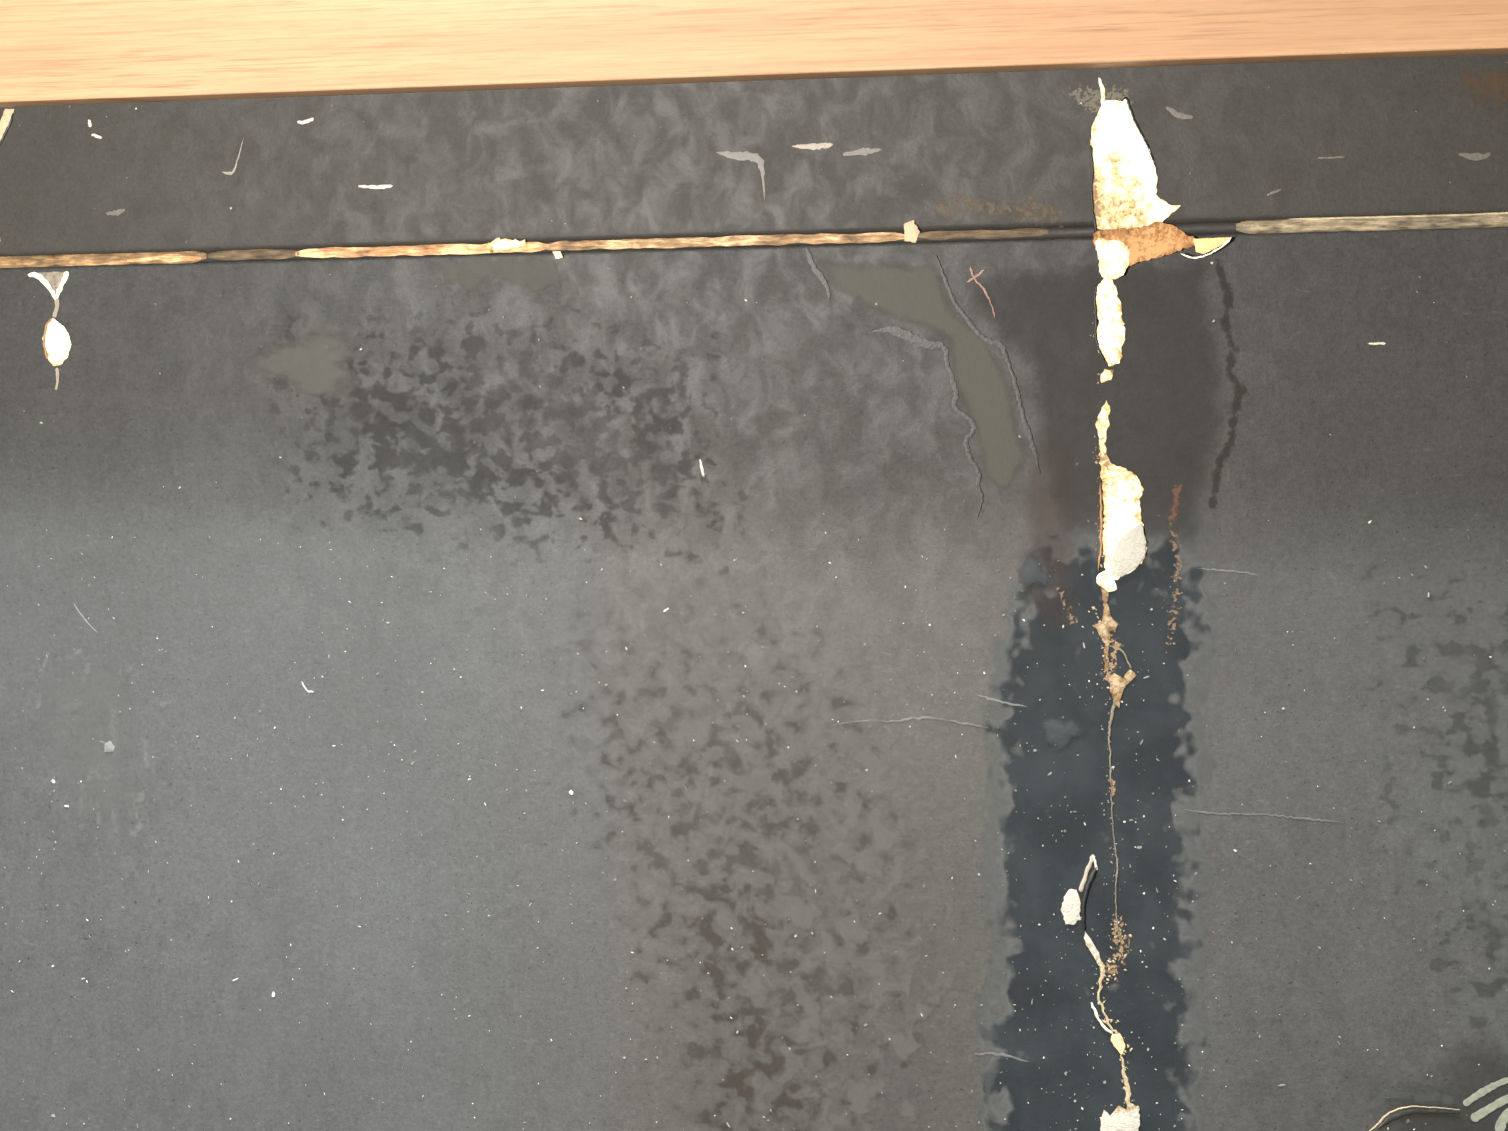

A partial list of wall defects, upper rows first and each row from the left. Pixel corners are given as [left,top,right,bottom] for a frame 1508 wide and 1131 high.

crack [0,109,14,145]
peeling [1090,78,1232,279]
peeling [28,271,71,390]
crack [1061,259,1147,1131]
leakage [979,531,1213,1131]
leakage [662,879,824,1129]
crack [976,1052,1029,1062]